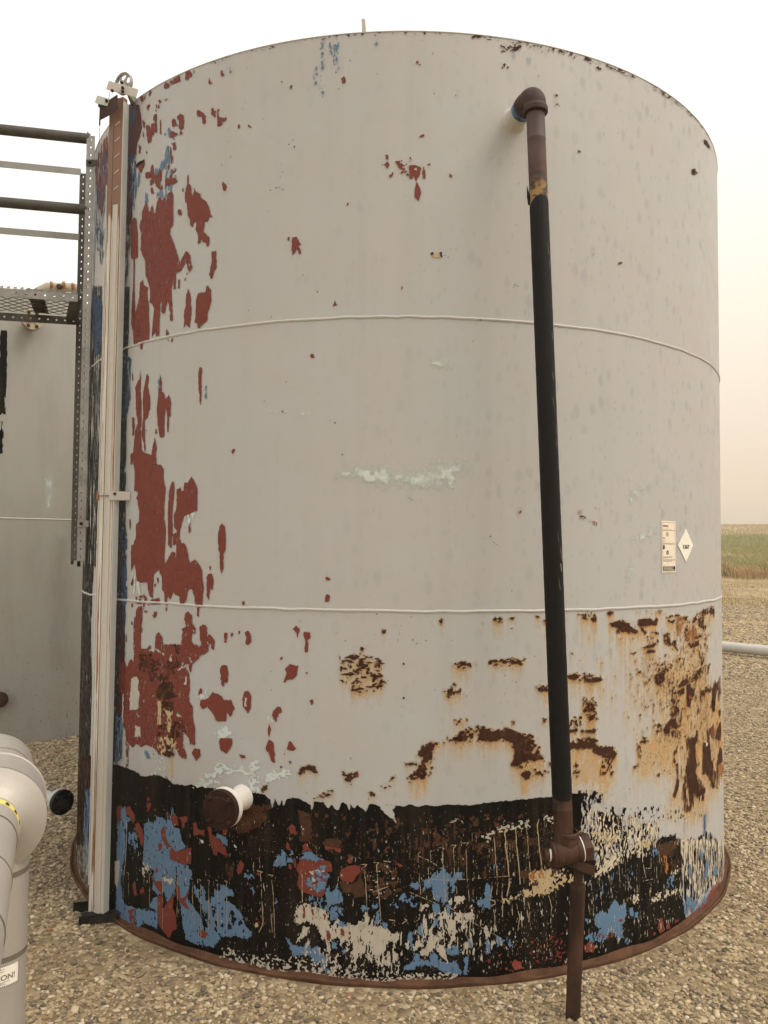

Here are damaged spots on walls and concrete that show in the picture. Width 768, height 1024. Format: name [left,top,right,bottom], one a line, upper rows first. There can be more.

peeling [382,154,430,200]
peeling [112,71,251,778]
leakage [341,463,464,488]
corrosion [329,629,388,697]
corrosion [368,656,551,805]
corrosion [567,605,724,822]
peeling [115,797,574,976]
peeling [572,790,725,953]